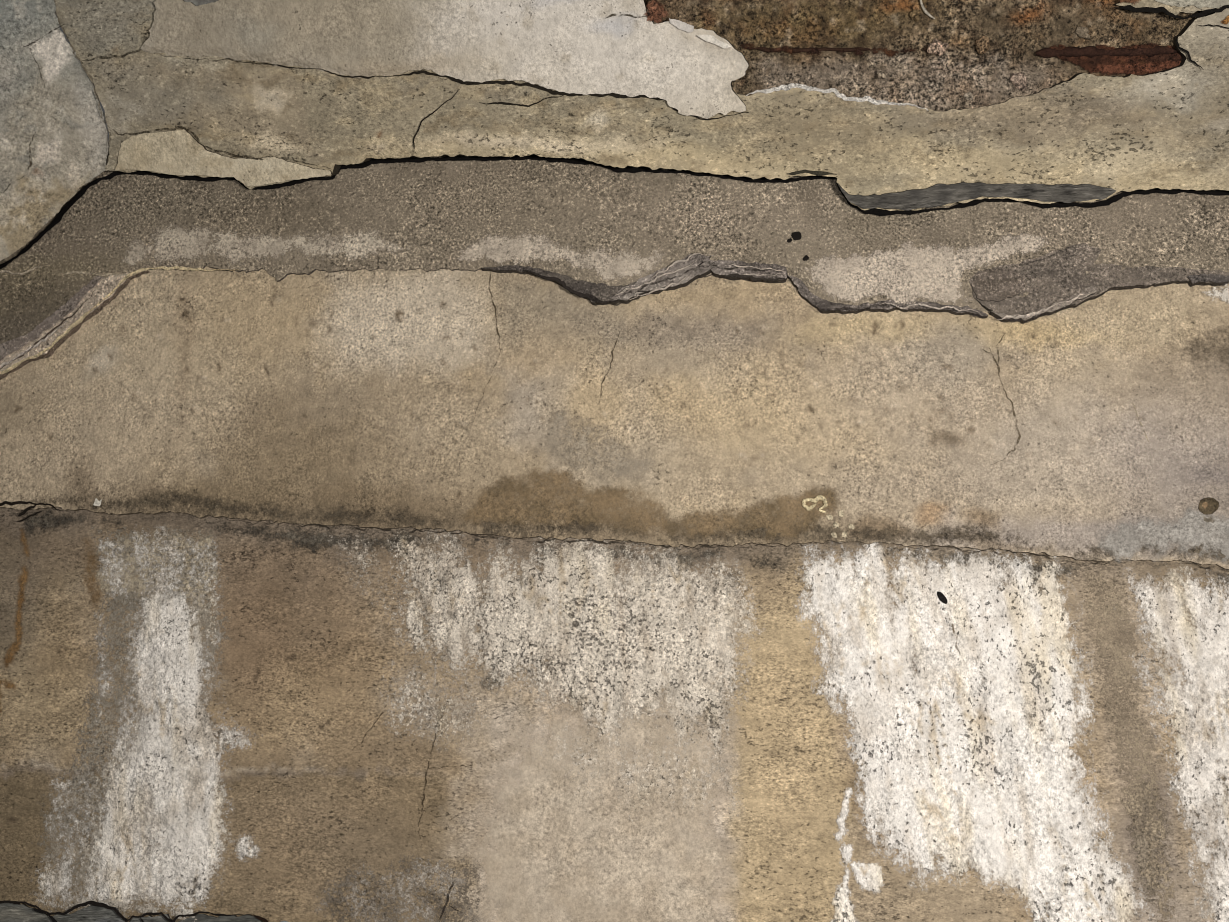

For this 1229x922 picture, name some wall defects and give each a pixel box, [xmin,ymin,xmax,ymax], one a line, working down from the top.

corrosion [645,0,667,23]
flaking render [140,0,1229,119]
corrosion [1036,43,1182,75]
crack [0,0,1229,269]
spalling [838,182,1116,210]
flaking render [481,243,1229,324]
crack [0,501,64,522]
crack [216,517,841,551]
corrosion [0,533,28,688]
leakage [38,525,258,920]
leakage [328,471,1229,922]
spalling [0,903,264,922]